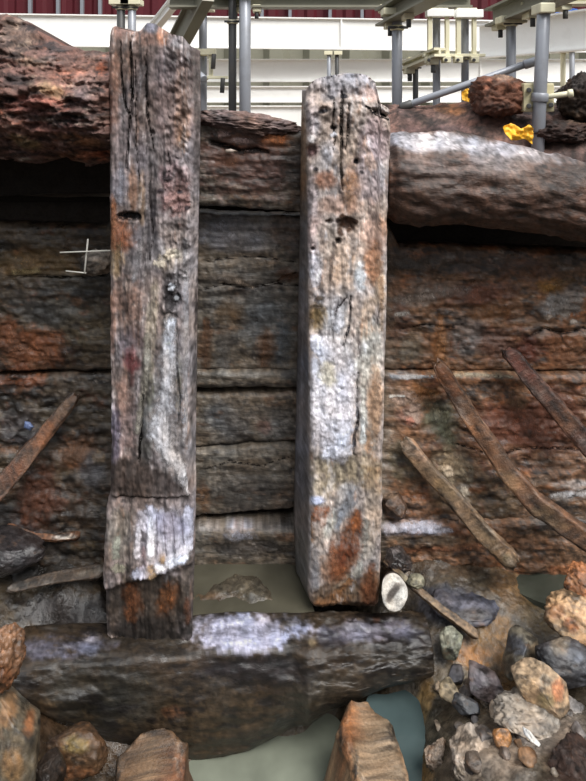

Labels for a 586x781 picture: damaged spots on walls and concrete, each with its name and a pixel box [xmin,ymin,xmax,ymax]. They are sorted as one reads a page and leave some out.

crack [120,36,170,260]
crack [332,98,389,190]
crack [332,296,352,345]